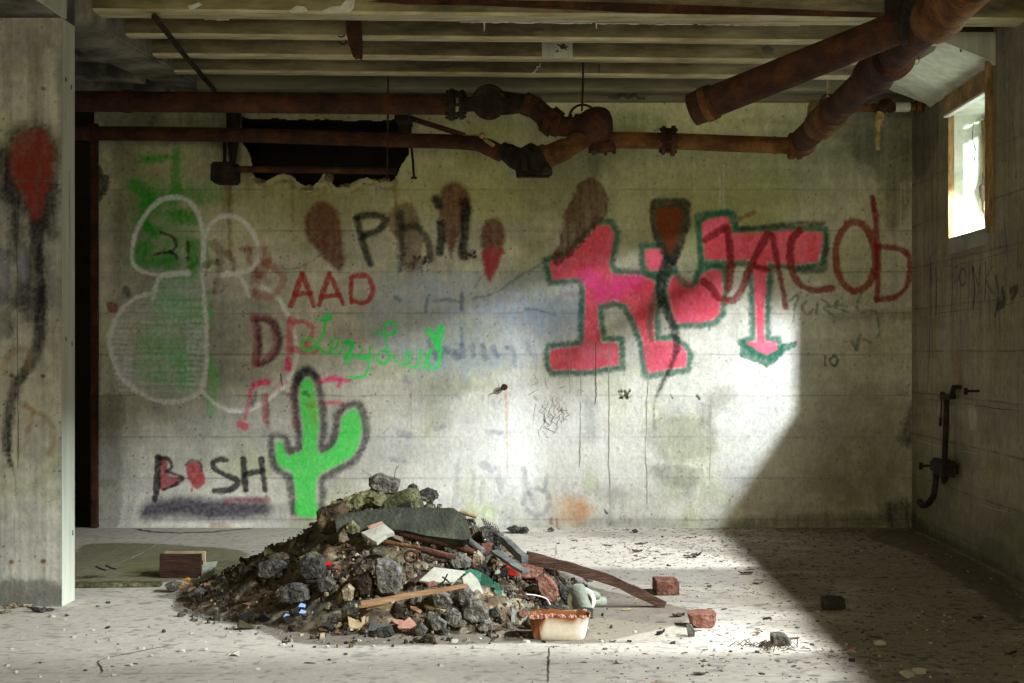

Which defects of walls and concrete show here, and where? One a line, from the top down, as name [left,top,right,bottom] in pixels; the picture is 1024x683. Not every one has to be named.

spalling [247,155,393,195]